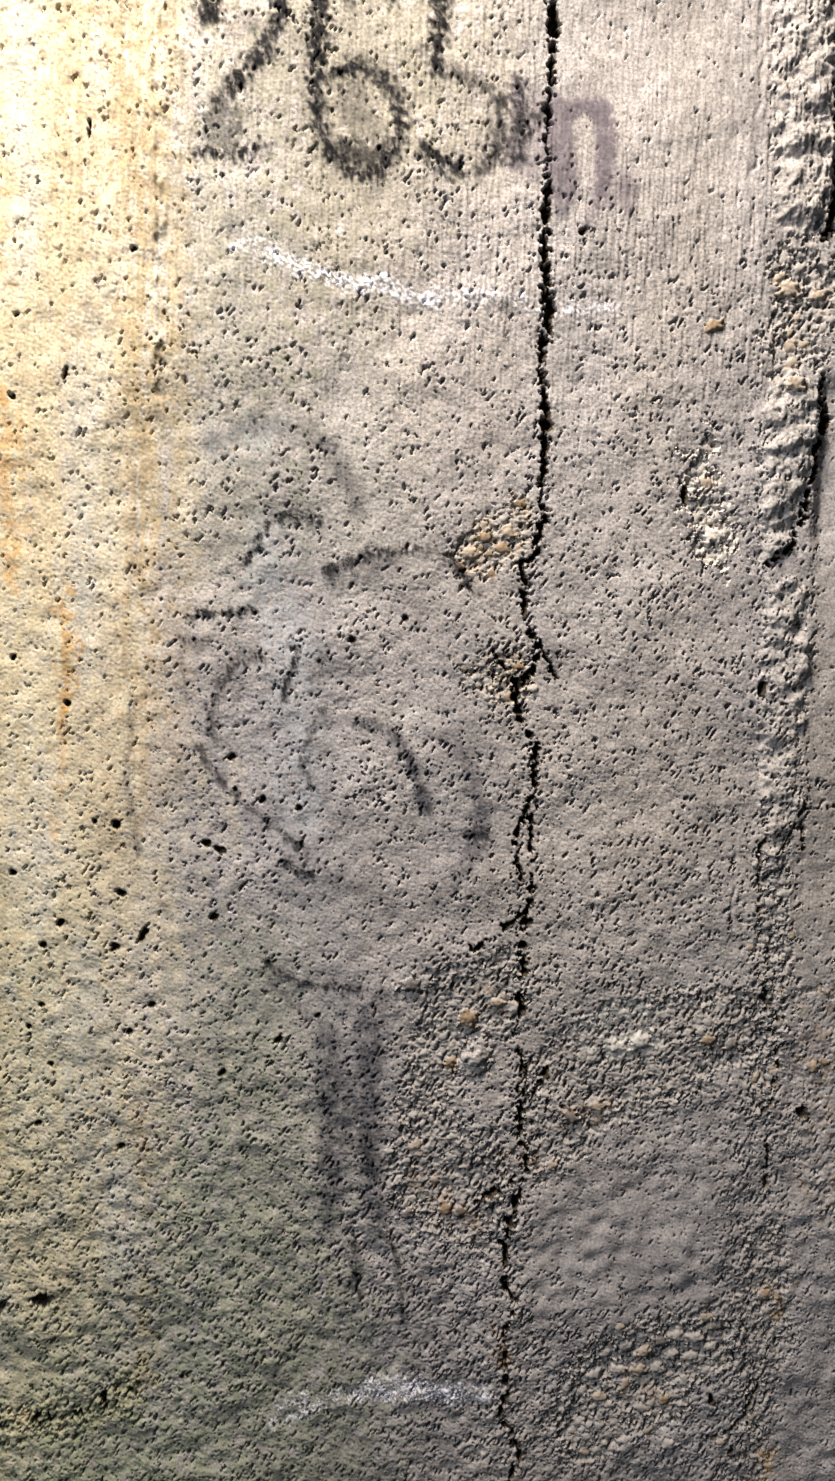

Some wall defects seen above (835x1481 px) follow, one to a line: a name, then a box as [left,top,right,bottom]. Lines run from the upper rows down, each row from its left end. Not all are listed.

crack [820,81,835,243]
crack [764,375,831,568]
crack [469,1,562,1481]
crack [701,1380,764,1460]